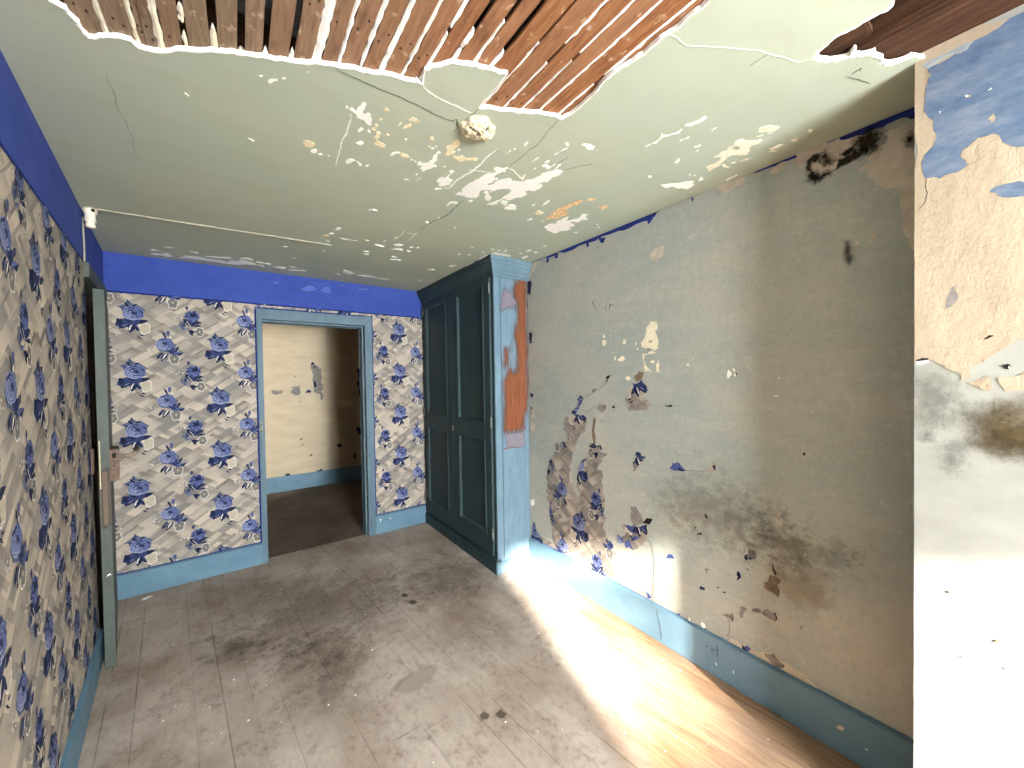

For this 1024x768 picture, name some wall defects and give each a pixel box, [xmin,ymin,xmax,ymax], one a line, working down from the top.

flaking render [48,0,710,120]
crack [338,70,478,129]
crack [335,119,351,166]
crack [398,124,555,240]
peeling [346,102,608,233]
peeling [645,116,716,151]
flaking render [662,1,1024,392]
damp [806,126,884,184]
peeling [150,247,306,271]
peeling [323,227,419,261]
peeling [449,245,547,295]
damp [970,402,1024,457]